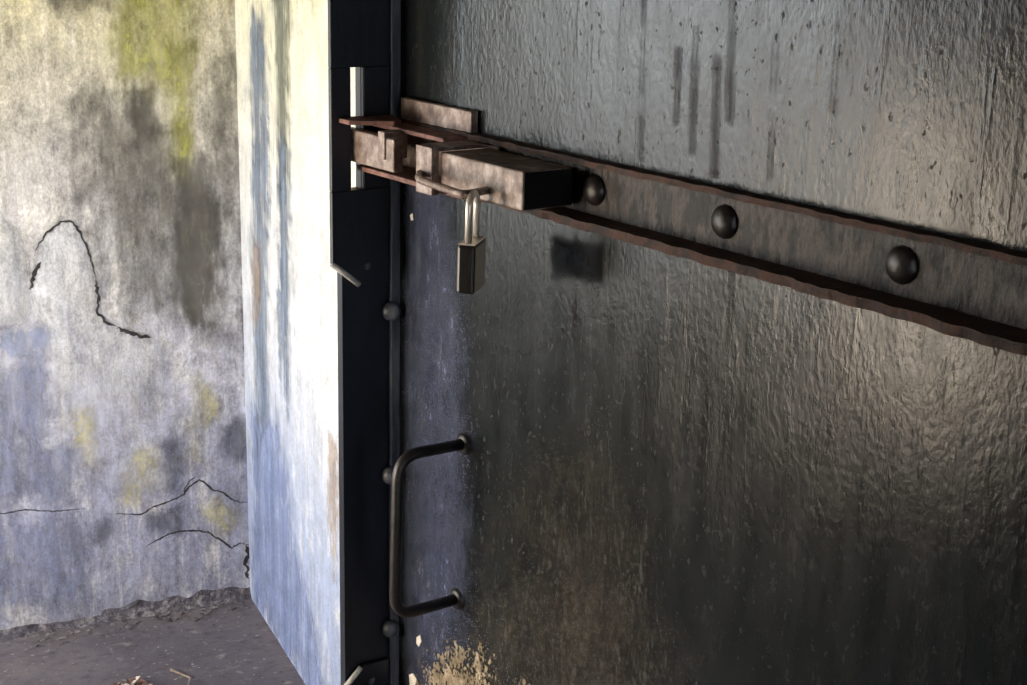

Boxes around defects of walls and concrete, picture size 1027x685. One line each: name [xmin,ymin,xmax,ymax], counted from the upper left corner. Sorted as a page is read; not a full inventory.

crack [29,220,151,339]
crack [0,507,84,515]
crack [117,476,247,515]
crack [145,530,250,579]
spalling [0,587,252,640]